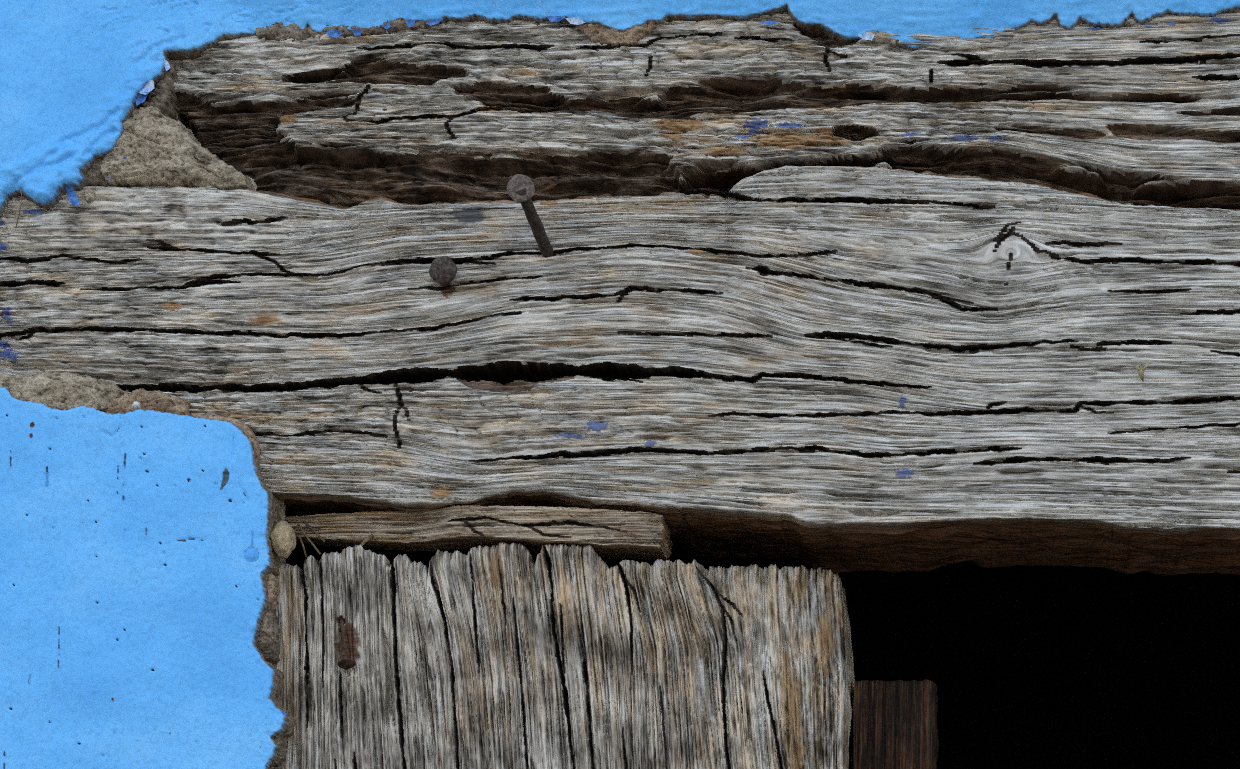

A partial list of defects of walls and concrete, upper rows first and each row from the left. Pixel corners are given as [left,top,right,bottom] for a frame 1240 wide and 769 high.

spalling [255,18,442,42]
spalling [547,16,666,48]
spalling [858,30,899,47]
peeling [66,59,257,206]
crack [0,216,1240,466]
peeling [0,372,261,464]
spalling [220,468,232,502]
rust [334,623,360,665]